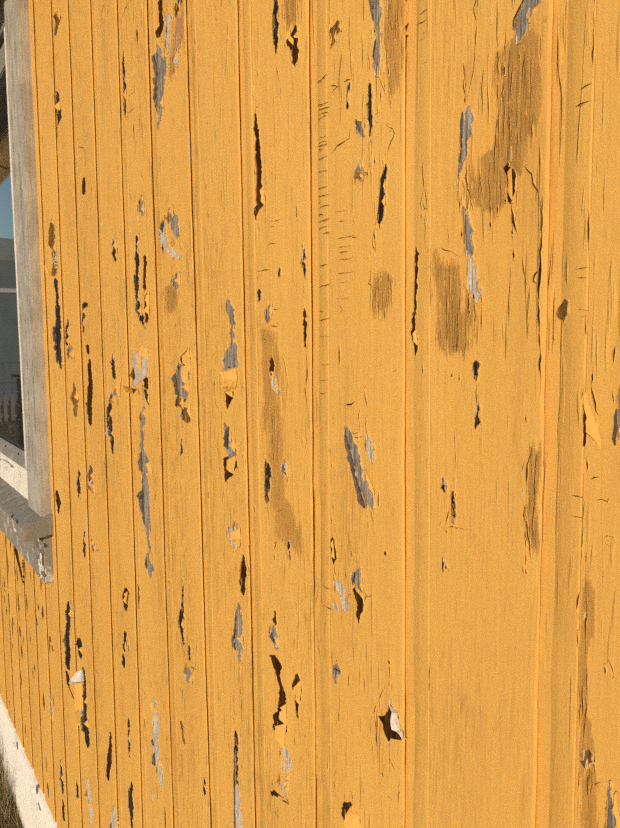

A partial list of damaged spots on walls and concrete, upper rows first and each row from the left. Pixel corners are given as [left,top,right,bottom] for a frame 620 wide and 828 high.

peeling [151,0,188,130]
peeling [272,0,302,81]
peeling [353,0,390,254]
peeling [44,217,74,373]
peeling [457,64,484,386]
peeling [70,344,99,428]
peeling [105,192,156,579]
peeling [208,298,240,485]
peeling [322,447,372,623]
peeling [344,407,380,528]
peeling [268,610,304,805]
peeling [370,659,407,786]